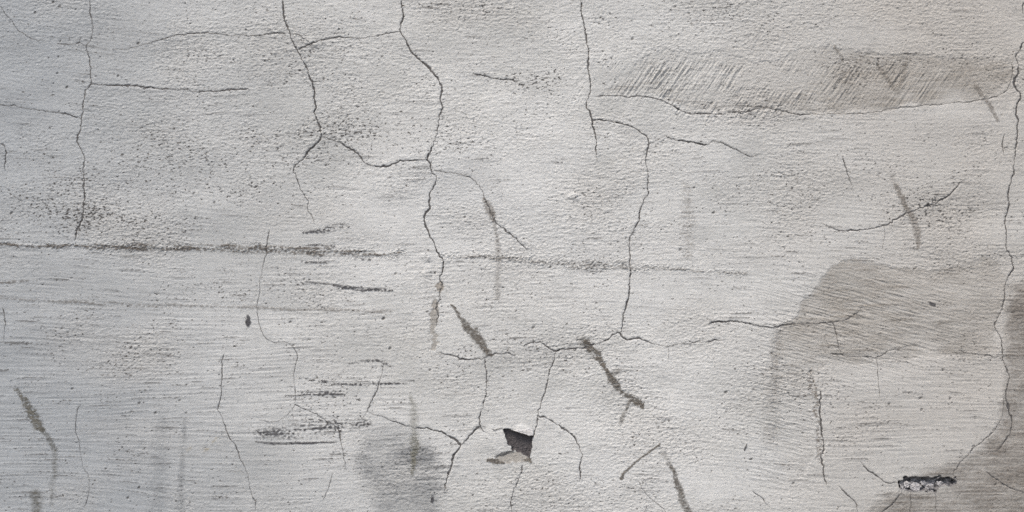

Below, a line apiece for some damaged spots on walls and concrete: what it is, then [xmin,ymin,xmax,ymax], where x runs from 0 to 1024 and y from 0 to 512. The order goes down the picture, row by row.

crack [217,354,256,504]
crack [0,0,529,325]
crack [257,232,346,503]
spalling [487,428,533,464]
crack [364,2,1024,512]
spalling [898,475,957,494]